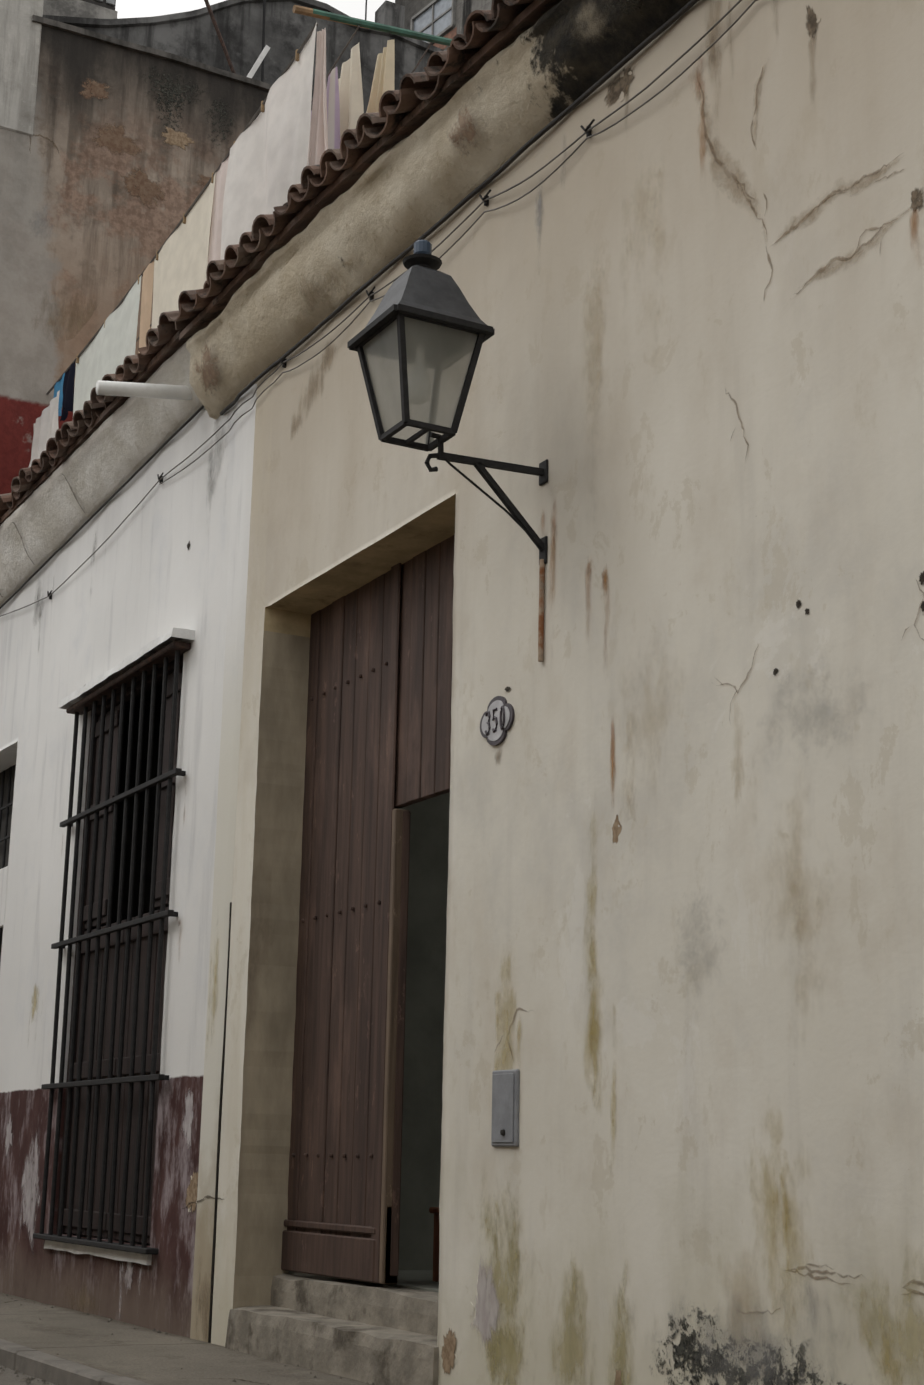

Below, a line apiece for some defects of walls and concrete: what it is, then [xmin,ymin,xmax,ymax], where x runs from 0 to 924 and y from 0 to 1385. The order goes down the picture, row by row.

crack [699,83,902,297]
water stain [656,1308,846,1385]